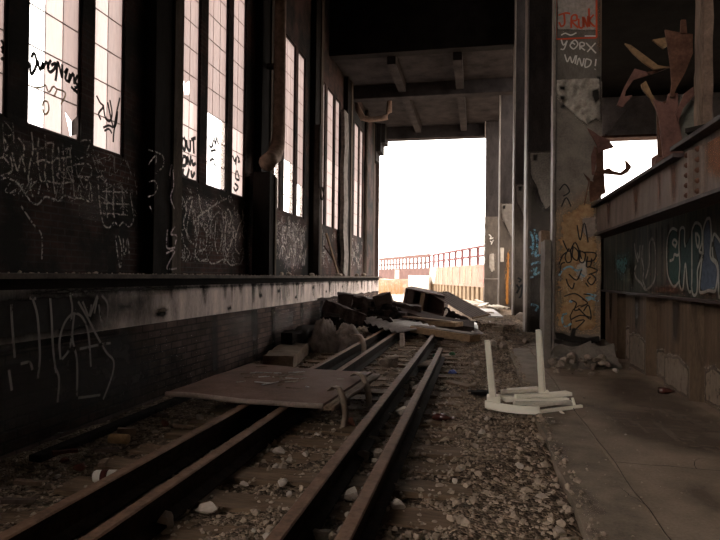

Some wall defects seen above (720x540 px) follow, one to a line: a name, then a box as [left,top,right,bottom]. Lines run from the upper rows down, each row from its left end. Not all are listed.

spalling [557,77,601,124]
leakage [0,280,378,455]